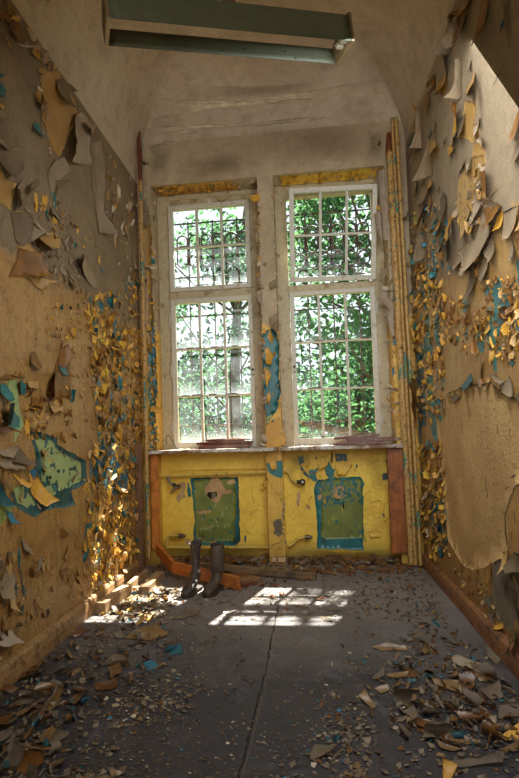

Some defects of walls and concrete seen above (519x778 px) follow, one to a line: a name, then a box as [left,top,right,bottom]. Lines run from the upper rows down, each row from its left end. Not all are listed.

peeling [272,167,402,444]
flaking render [358,0,519,767]
peeling [298,452,358,508]
crack [485,463,519,548]
crack [237,602,282,778]